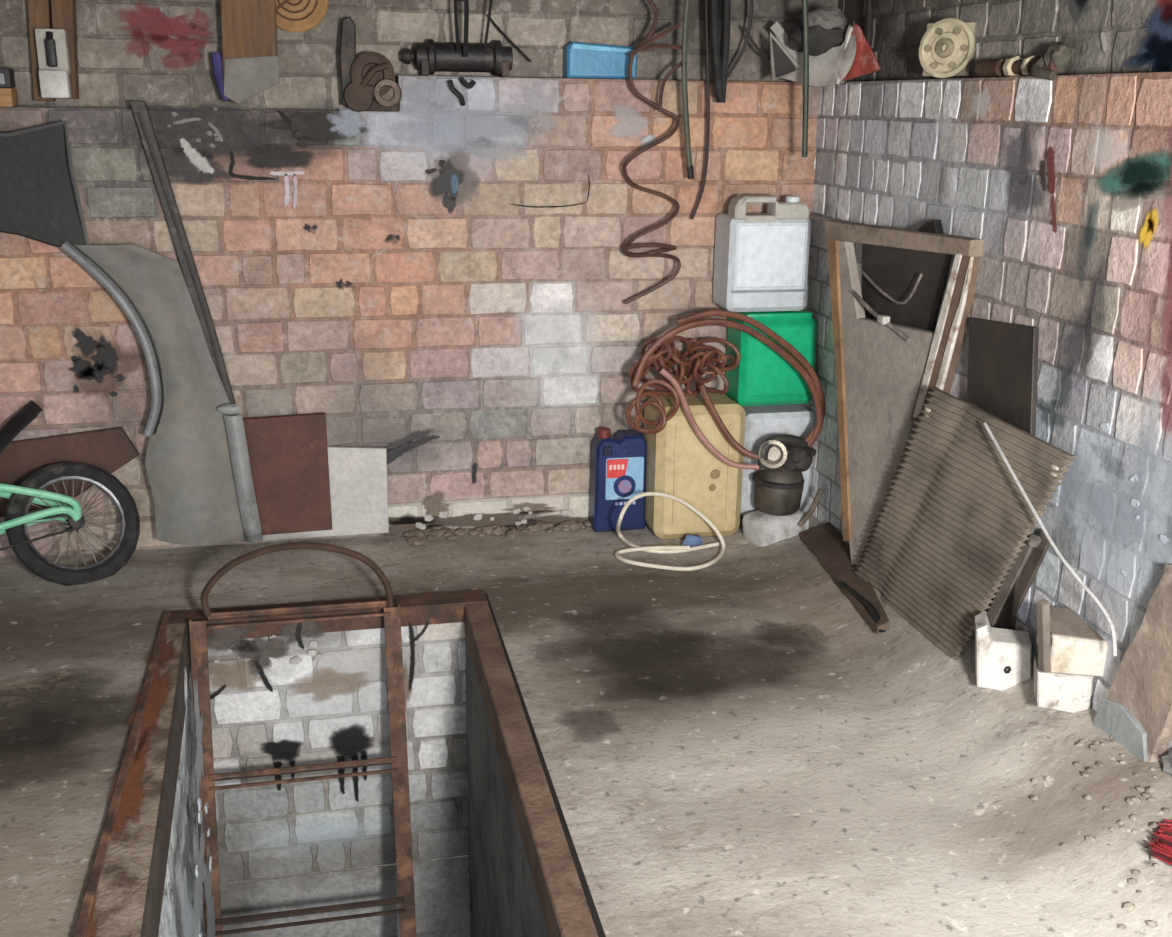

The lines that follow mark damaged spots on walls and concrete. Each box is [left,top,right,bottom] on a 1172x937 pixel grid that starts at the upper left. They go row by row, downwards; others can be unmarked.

rust [110,639,174,834]
rust [299,672,363,699]